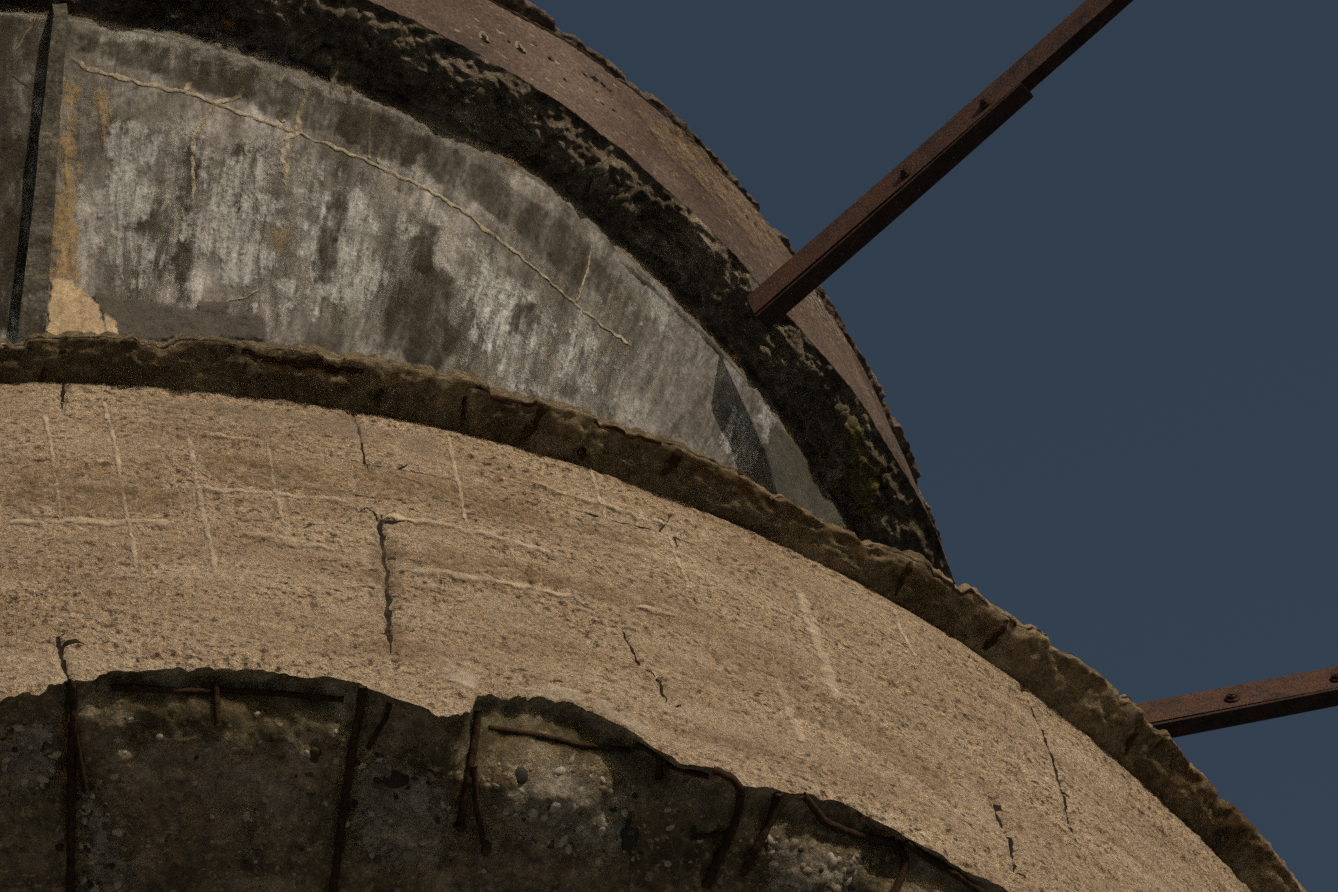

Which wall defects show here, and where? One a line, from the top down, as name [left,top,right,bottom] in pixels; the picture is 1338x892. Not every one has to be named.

water stain [0,14,48,329]
peeling [0,278,675,441]
water stain [80,28,612,301]
crack [74,59,632,346]
water stain [278,164,607,396]
water stain [625,263,725,357]
water stain [721,406,850,527]
crack [359,507,402,655]
spalling [0,678,164,892]
spalling [111,684,984,892]
crack [989,797,1027,879]
crack [1021,686,1079,844]